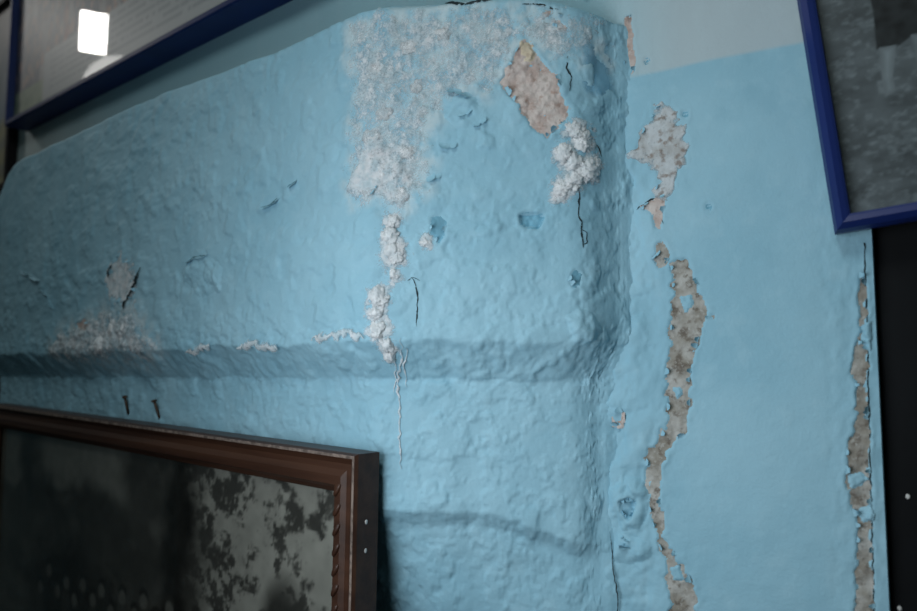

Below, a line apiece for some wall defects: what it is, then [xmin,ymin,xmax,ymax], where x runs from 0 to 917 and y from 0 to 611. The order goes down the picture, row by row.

peeling [500,39,571,138]
peeling [104,251,136,310]
damp [311,6,603,466]
crack [578,191,588,248]
peeling [626,101,689,229]
peeling [643,241,715,611]
peeling [845,272,875,611]